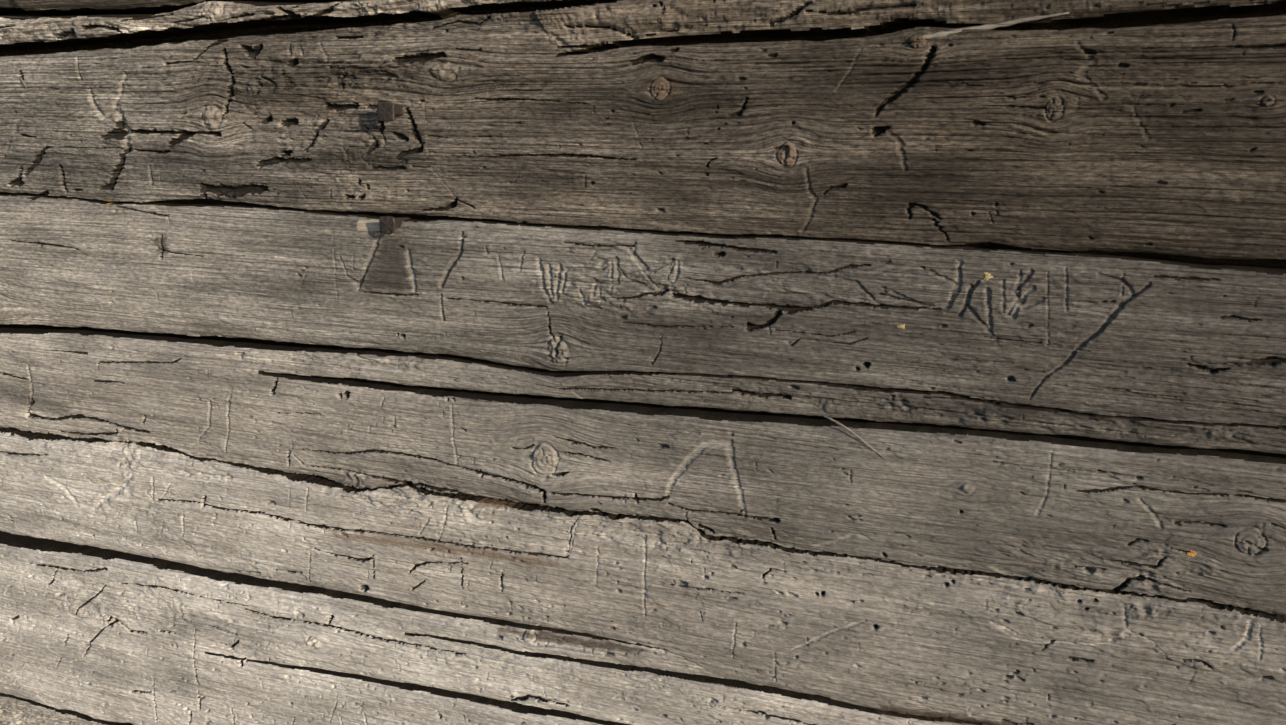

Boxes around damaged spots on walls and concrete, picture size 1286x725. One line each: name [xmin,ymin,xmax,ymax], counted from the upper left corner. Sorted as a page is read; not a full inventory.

crack [20,1,385,154]
crack [432,15,491,51]
crack [876,45,937,116]
crack [616,240,942,346]